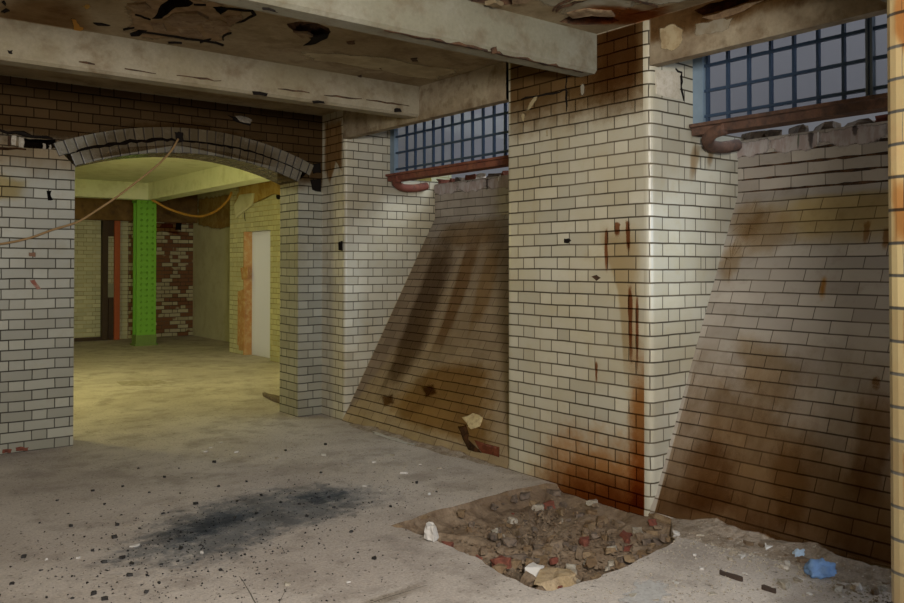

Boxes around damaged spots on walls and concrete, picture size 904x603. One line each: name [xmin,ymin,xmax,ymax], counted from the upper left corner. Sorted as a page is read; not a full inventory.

spalling [123,0,256,46]
spalling [469,0,792,51]
peeling [287,21,458,81]
spalling [741,114,888,140]
corrosion [605,222,630,268]
corrosion [628,289,638,355]
spalling [458,413,499,457]